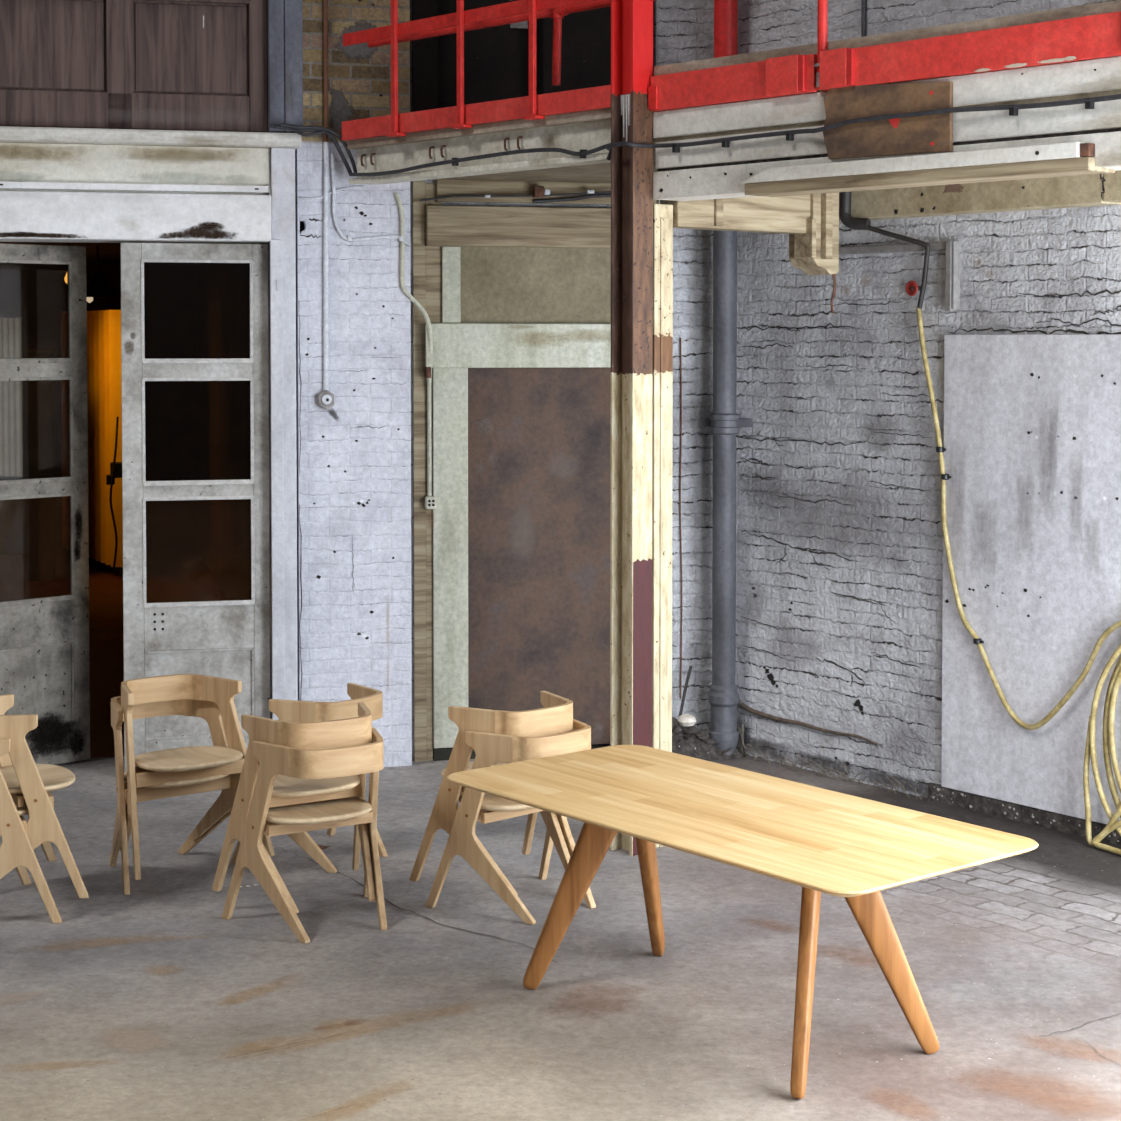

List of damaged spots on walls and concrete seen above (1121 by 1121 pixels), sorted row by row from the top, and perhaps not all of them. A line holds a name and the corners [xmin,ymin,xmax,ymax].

crack [741,301,902,370]
crack [948,289,1121,335]
crack [739,431,932,506]
crack [741,530,896,624]
crack [741,616,922,686]